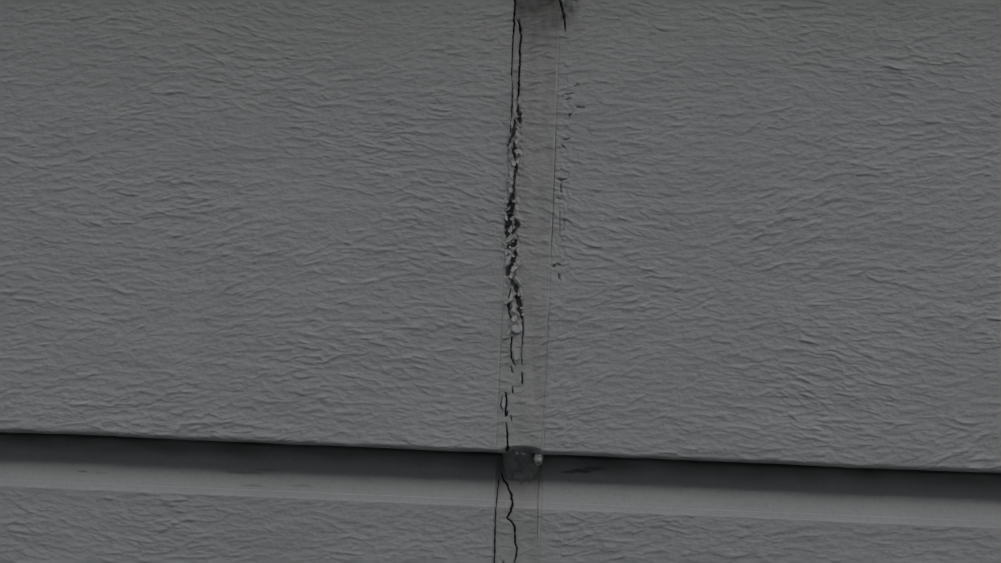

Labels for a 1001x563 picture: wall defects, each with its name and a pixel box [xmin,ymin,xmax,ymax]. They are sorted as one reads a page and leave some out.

crack [559,0,576,30]
crack [549,133,557,244]
crack [493,0,548,563]